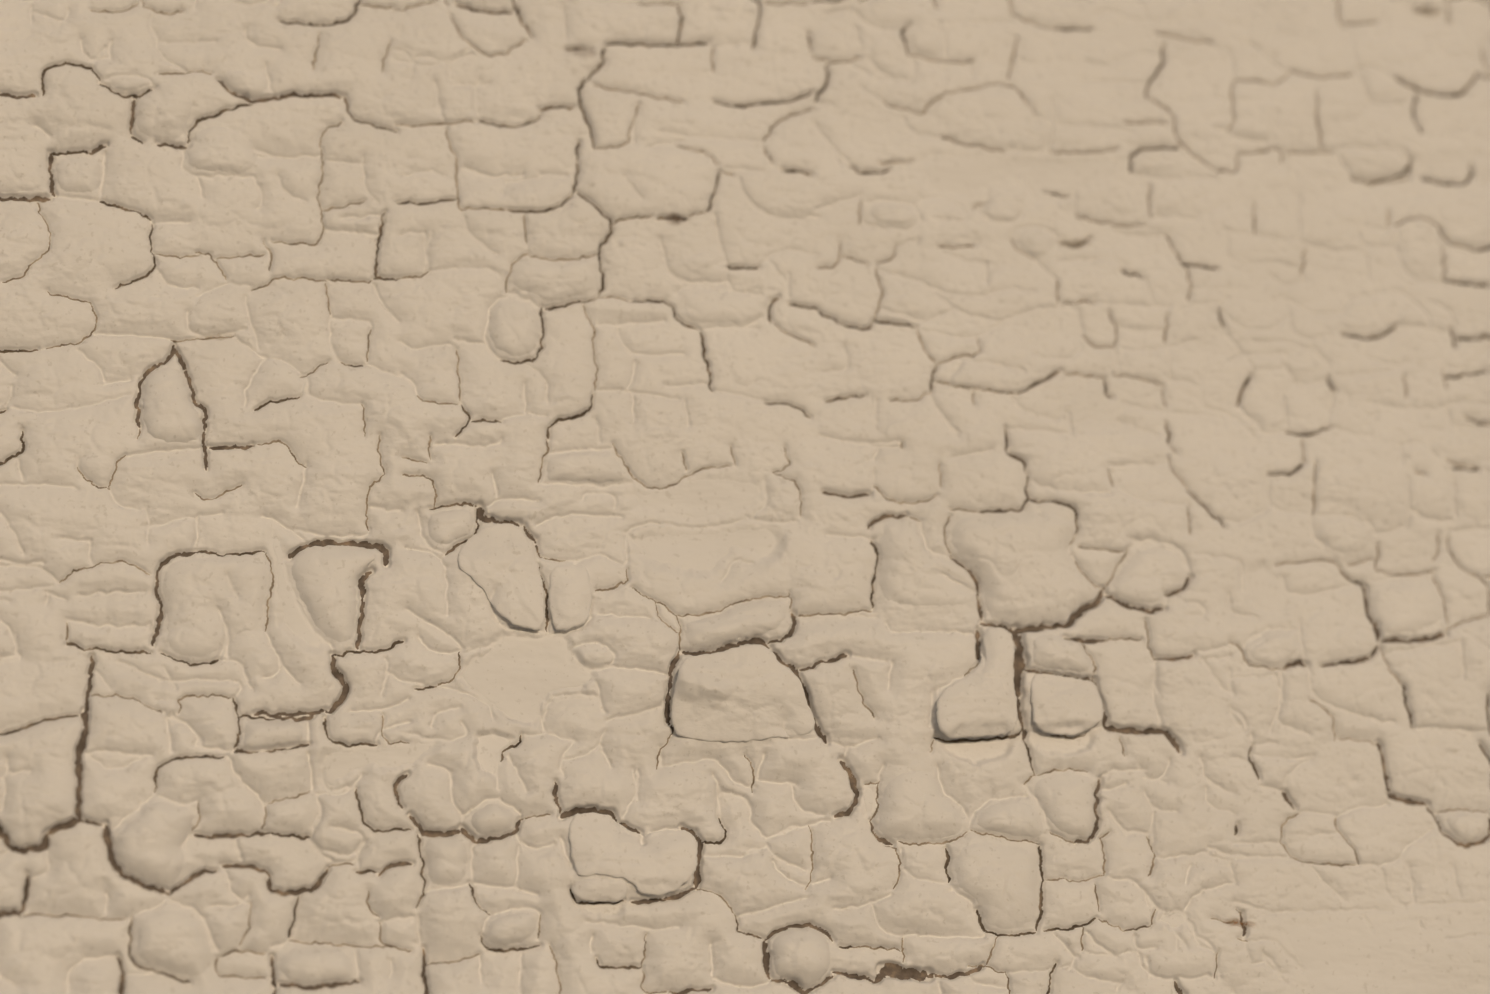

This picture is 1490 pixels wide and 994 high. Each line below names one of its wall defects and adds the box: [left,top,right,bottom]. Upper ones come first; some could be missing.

crack [0,0,863,501]
crack [883,0,1091,153]
crack [727,33,1490,535]
crack [0,350,640,994]
spalling [458,523,592,722]
crack [570,429,1193,994]
crack [1174,909,1248,994]
crack [1228,534,1490,867]